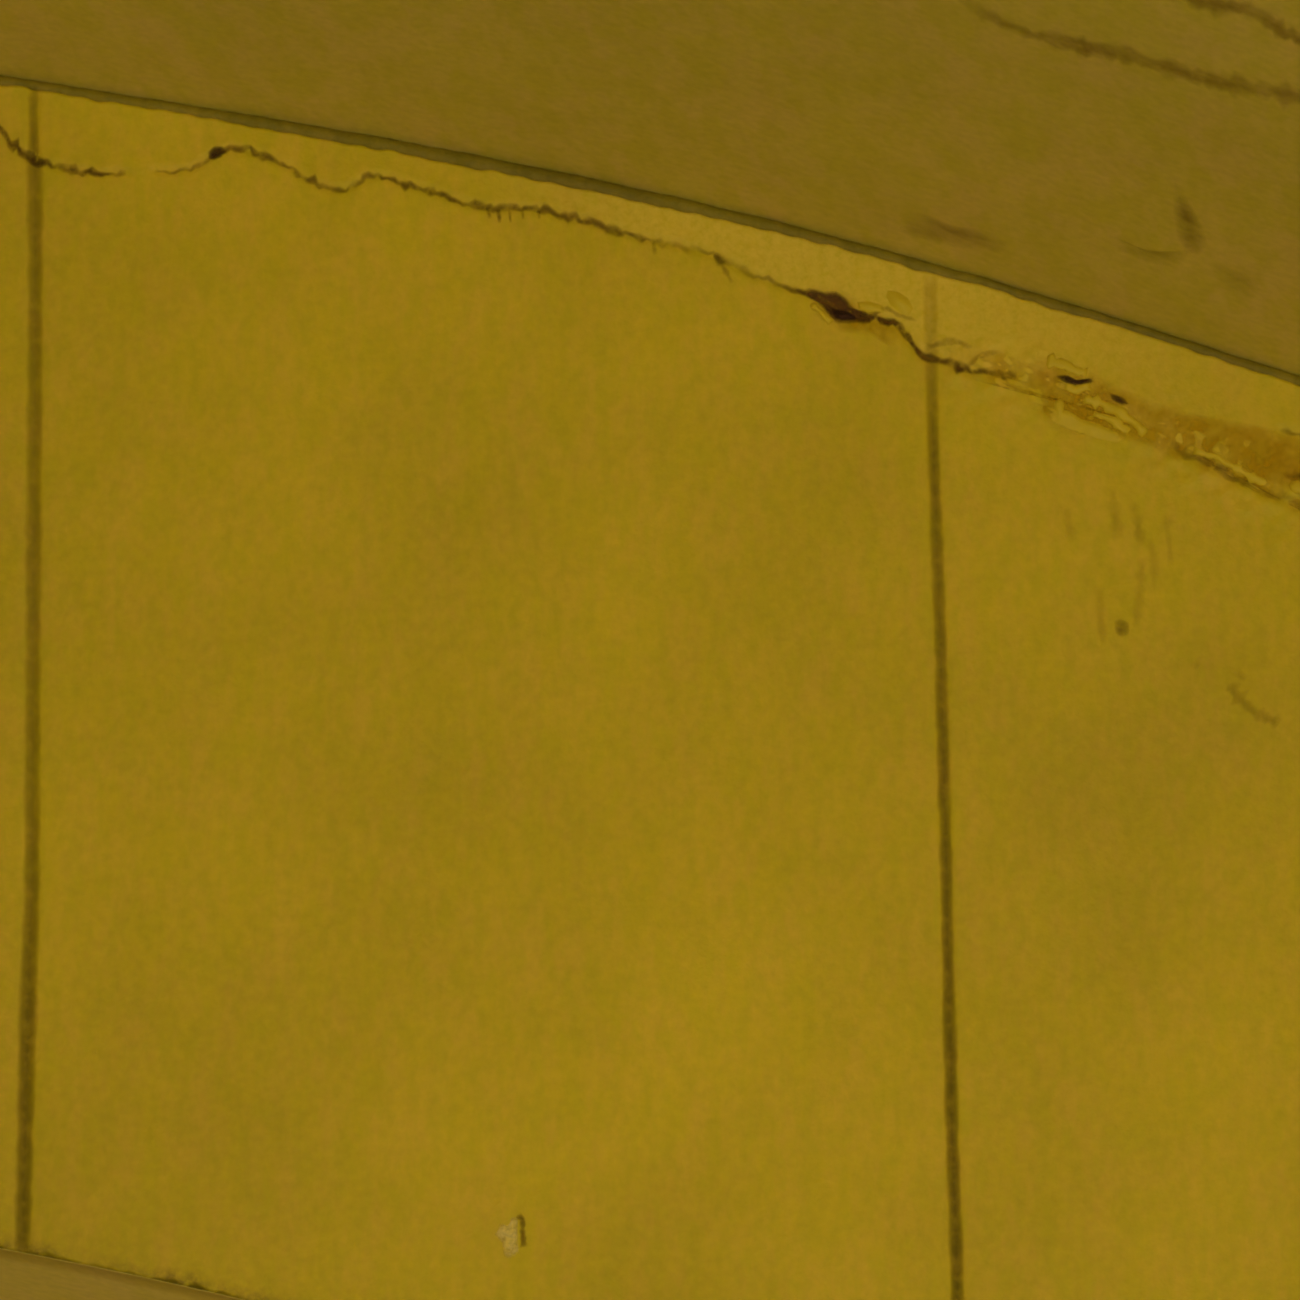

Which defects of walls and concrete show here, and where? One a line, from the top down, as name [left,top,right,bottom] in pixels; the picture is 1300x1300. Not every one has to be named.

crack [0,127,109,176]
crack [224,147,342,191]
crack [381,177,633,236]
crack [859,314,1000,374]
peeling [1046,352,1148,437]